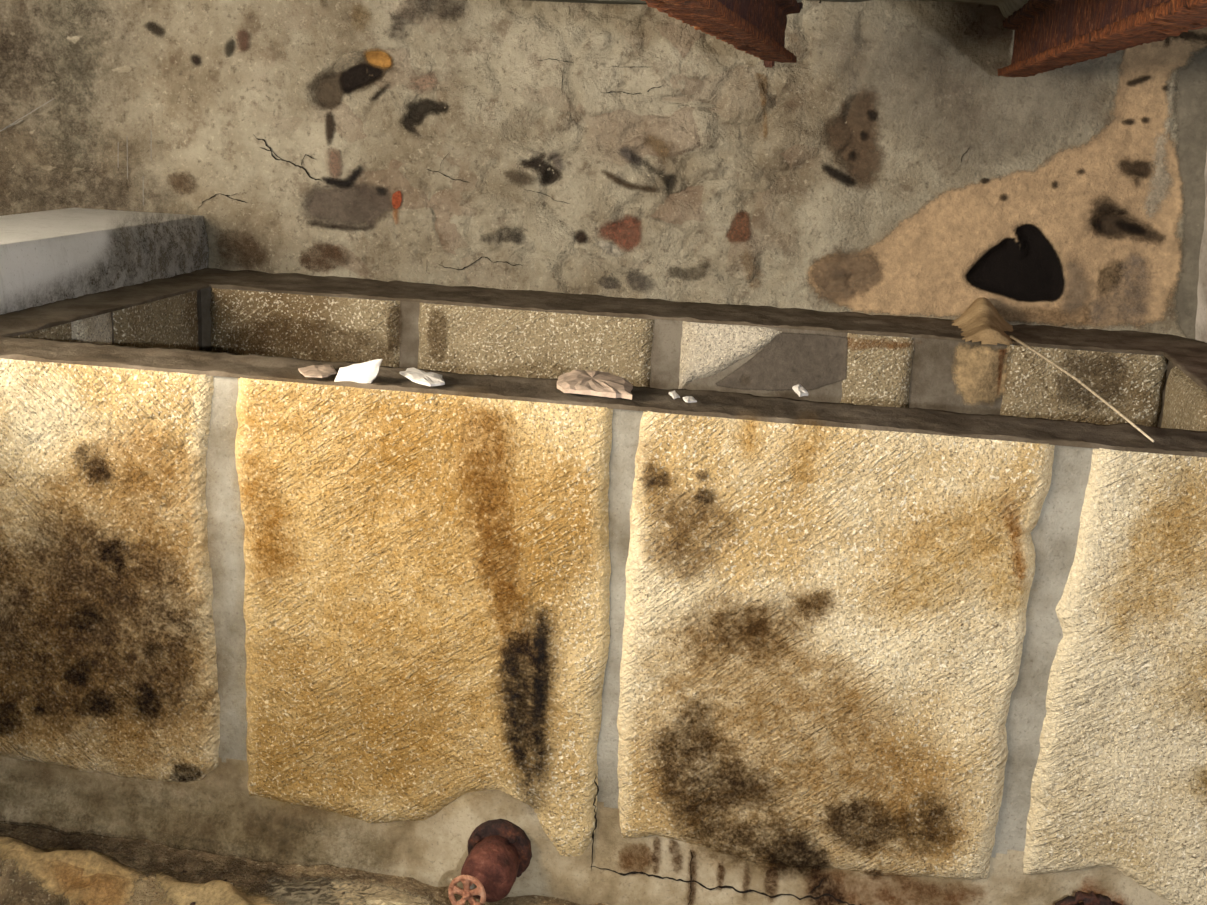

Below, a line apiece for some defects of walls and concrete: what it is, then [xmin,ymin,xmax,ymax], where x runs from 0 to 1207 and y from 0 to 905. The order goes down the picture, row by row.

peeling [808,27,1207,328]
damp [0,542,139,682]
damp [503,638,547,754]
damp [663,723,762,835]
crack [591,776,861,905]
damp [732,827,842,905]